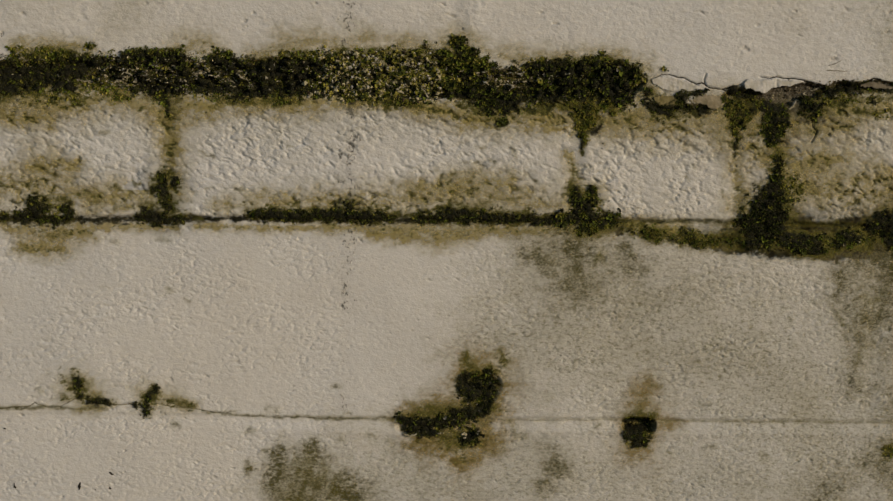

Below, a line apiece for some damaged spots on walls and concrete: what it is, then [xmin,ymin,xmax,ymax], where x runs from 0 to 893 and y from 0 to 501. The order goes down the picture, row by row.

leakage [252,2,375,60]
leakage [0,51,893,256]
leakage [193,130,700,302]
crack [653,74,741,93]
leakage [772,218,893,393]
crack [1,398,133,409]